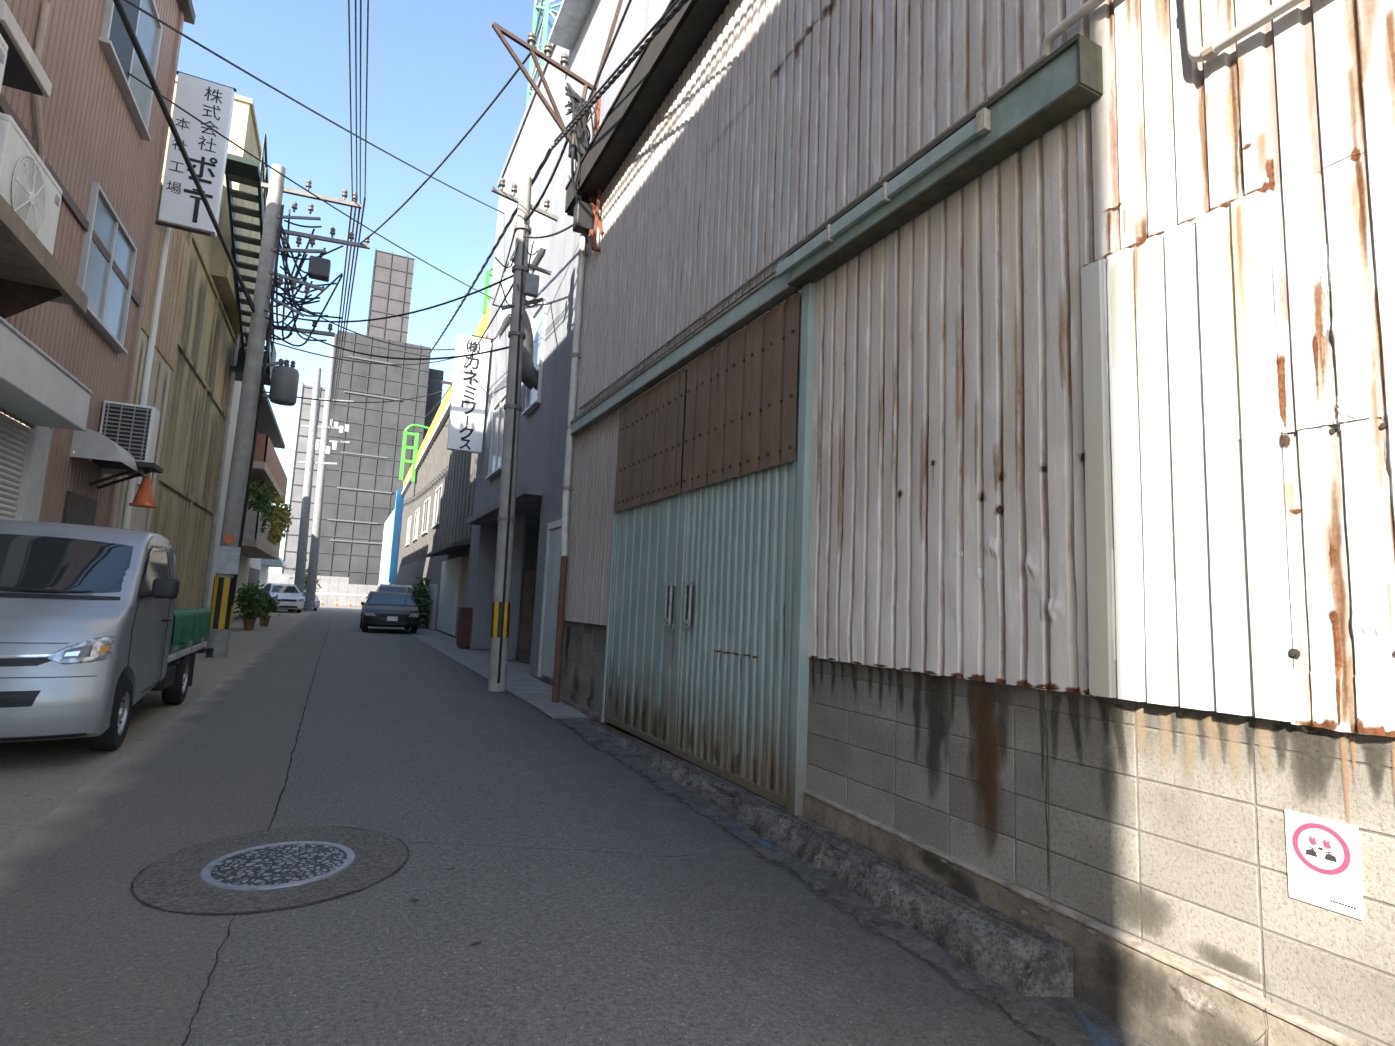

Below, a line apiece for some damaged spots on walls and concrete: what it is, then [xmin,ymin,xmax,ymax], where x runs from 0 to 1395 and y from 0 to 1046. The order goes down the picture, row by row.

rust [1349,0,1395,245]
rust [1276,354,1291,448]
rust [1313,286,1325,390]
rust [1373,292,1385,431]
rust [852,661,1093,818]
leakage [1039,692,1126,780]
leakage [1246,719,1254,753]
leakage [1274,724,1334,789]
leakage [1364,743,1386,788]
crack [132,621,713,1046]
leakage [921,851,978,900]
leakage [1204,949,1251,978]